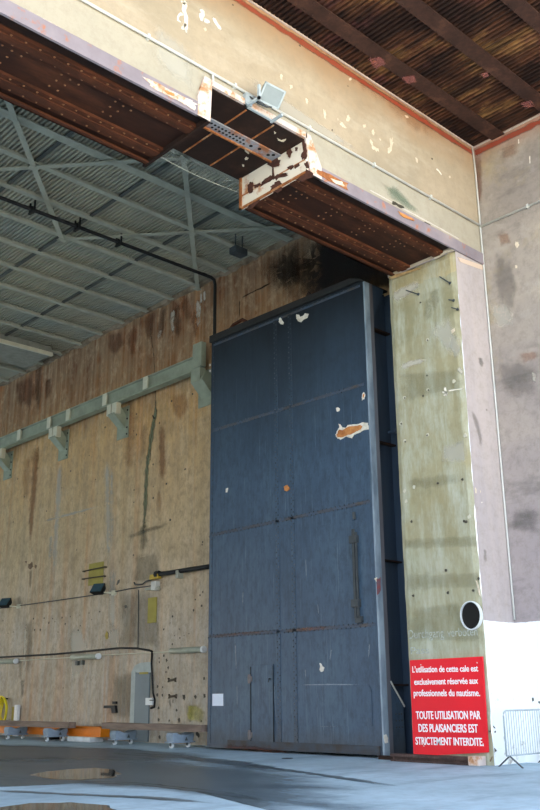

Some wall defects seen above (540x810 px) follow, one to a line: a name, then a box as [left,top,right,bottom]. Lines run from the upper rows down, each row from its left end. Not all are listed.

peeling [247,131,348,209]
peeling [363,124,393,153]
crack [143,337,157,531]
peeling [335,422,369,440]